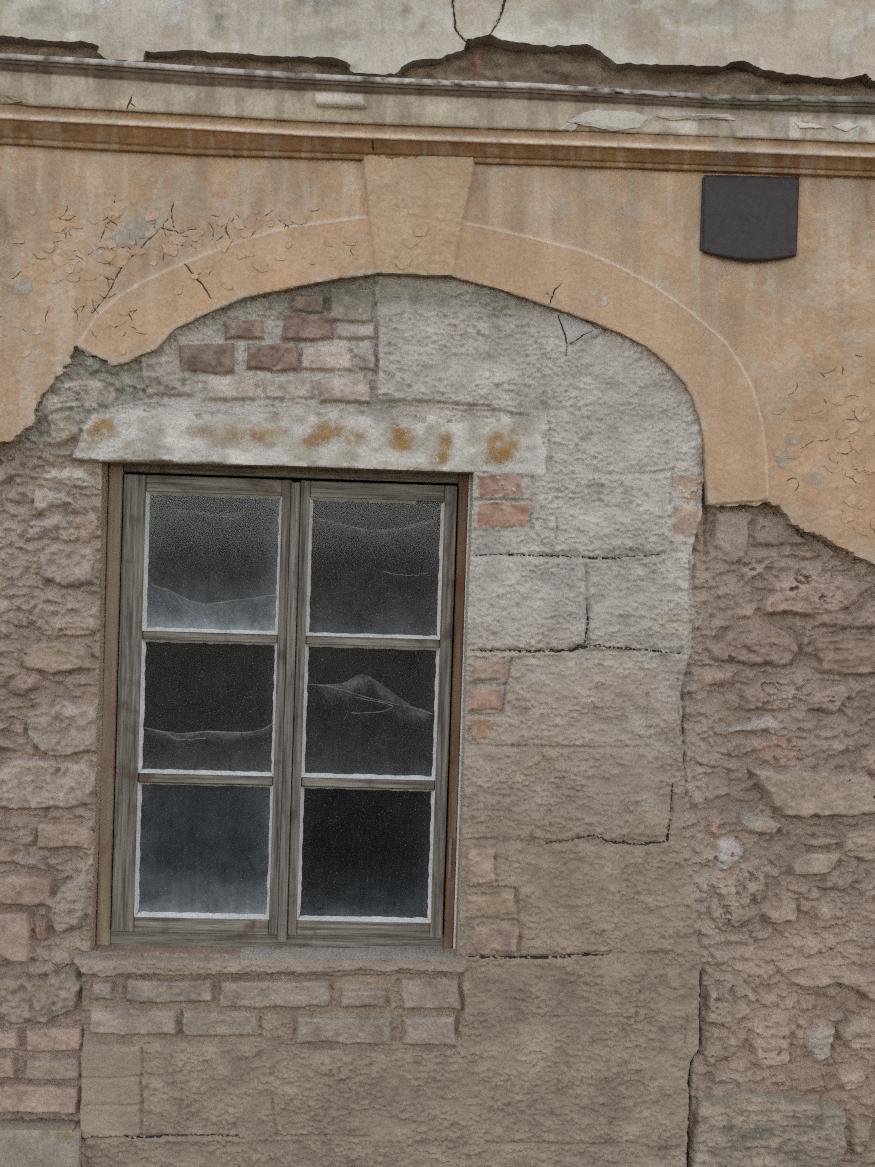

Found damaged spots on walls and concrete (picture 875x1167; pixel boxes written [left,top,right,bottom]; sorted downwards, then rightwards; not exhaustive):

crack [452,0,506,43]
spalling [0,43,100,59]
spalling [146,56,350,75]
spalling [399,42,875,97]
spalling [0,275,468,1122]
spalling [681,499,875,1167]